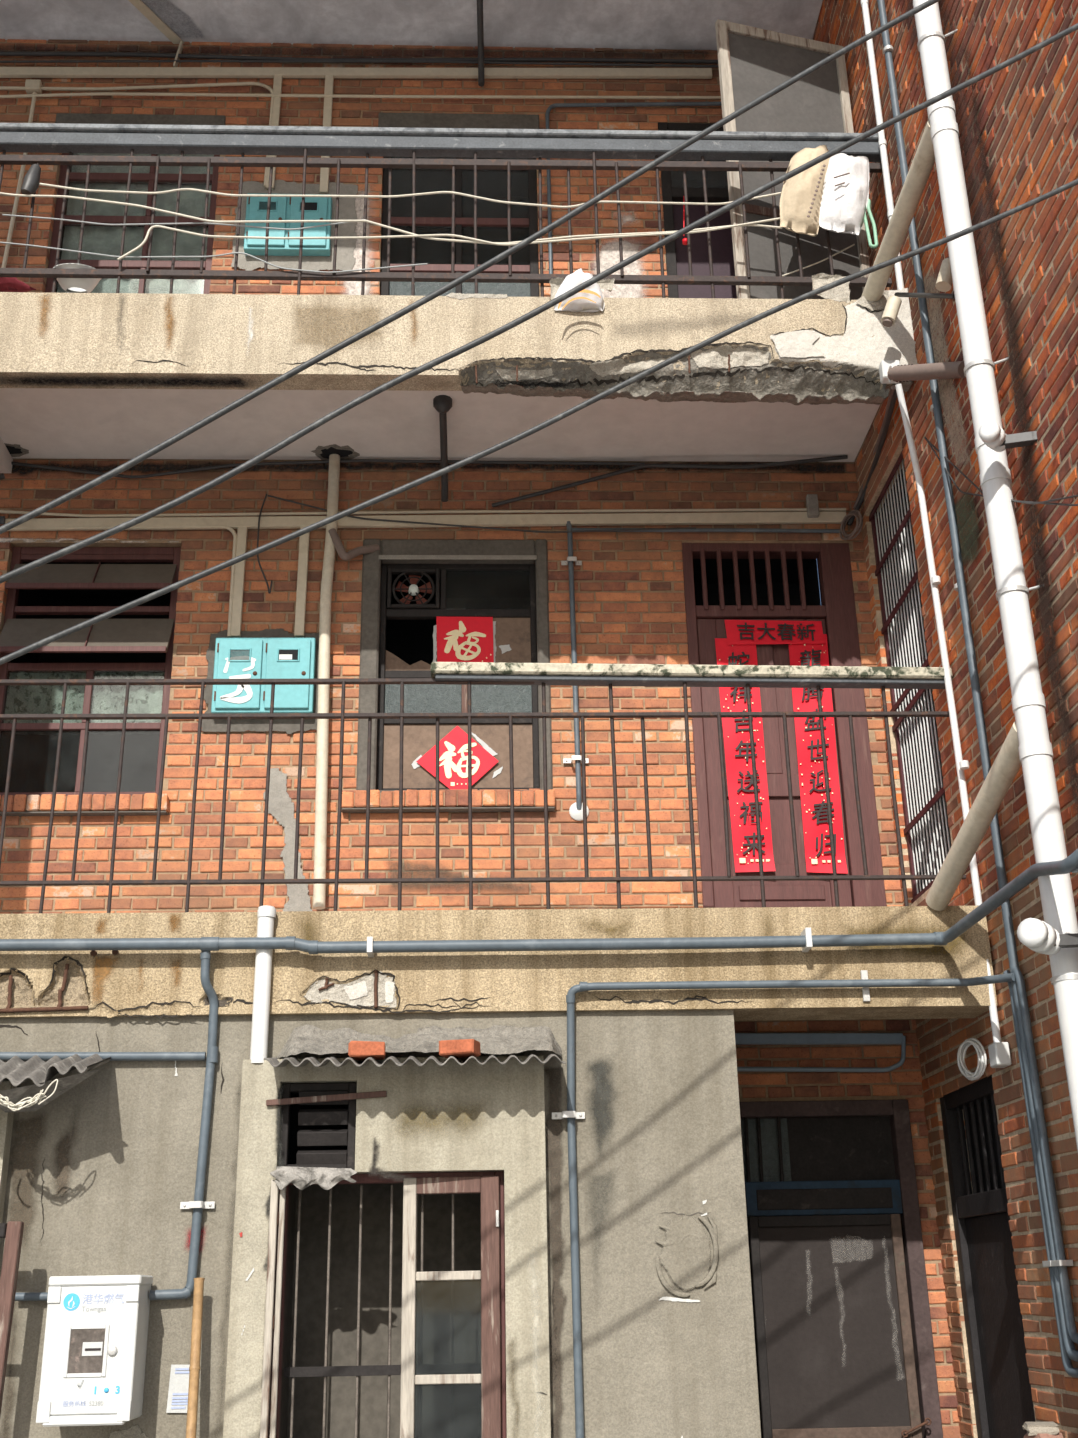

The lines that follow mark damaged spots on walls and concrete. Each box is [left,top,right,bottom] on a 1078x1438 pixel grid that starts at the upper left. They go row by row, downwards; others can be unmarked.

corrosion [165,304,173,341]
crack [280,362,456,371]
spalling [457,330,890,405]
spalling [0,956,233,1018]
spalling [301,969,400,1009]
damp [401,1108,476,1130]
damp [591,1061,613,1145]
damp [534,1068,566,1438]